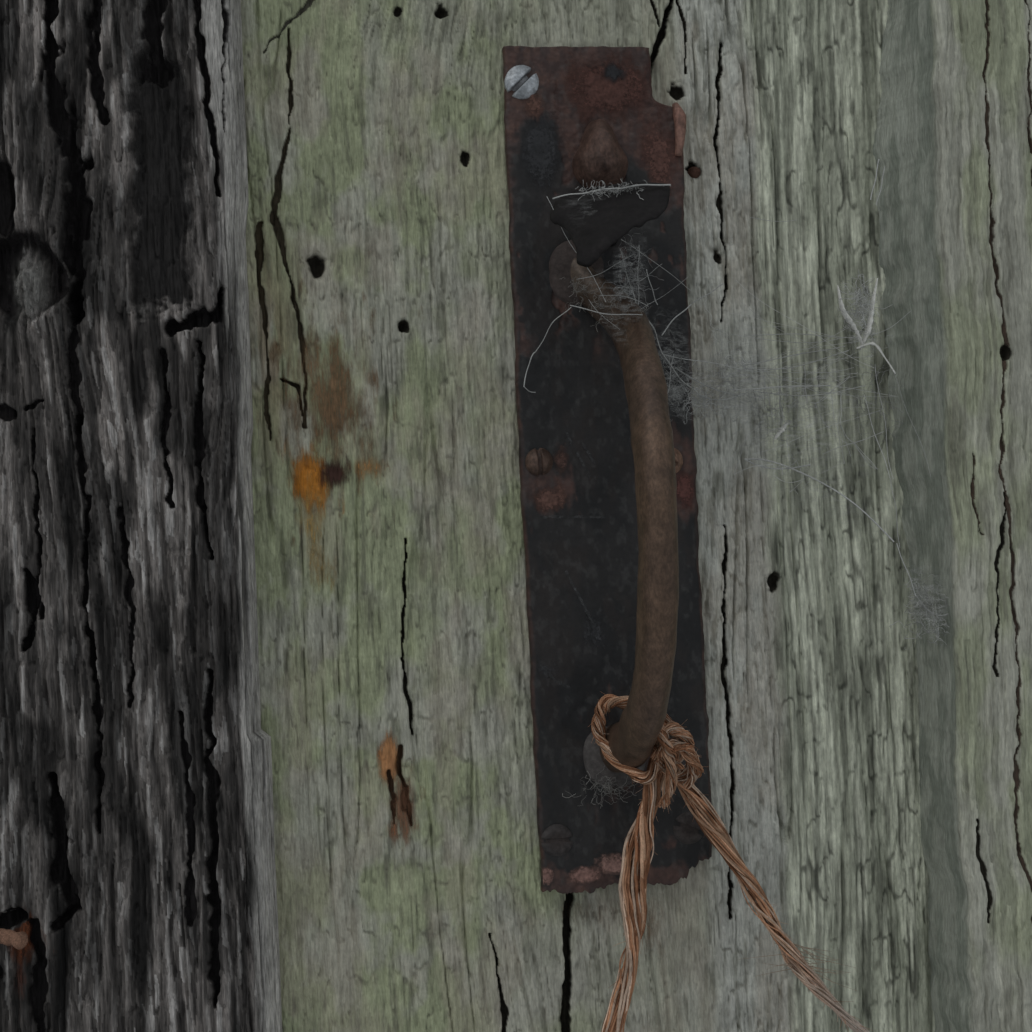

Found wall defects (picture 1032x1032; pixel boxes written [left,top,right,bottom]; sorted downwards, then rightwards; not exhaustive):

crack [650,0,687,74]
crack [255,29,307,441]
crack [713,43,728,323]
corrosion [272,330,380,580]
crack [970,0,1032,891]
crack [401,538,413,735]
crack [720,525,735,837]
corrosion [377,733,415,840]
crack [488,933,509,1032]
crack [560,893,573,1032]
corrosion [570,855,622,883]
crack [976,819,993,923]